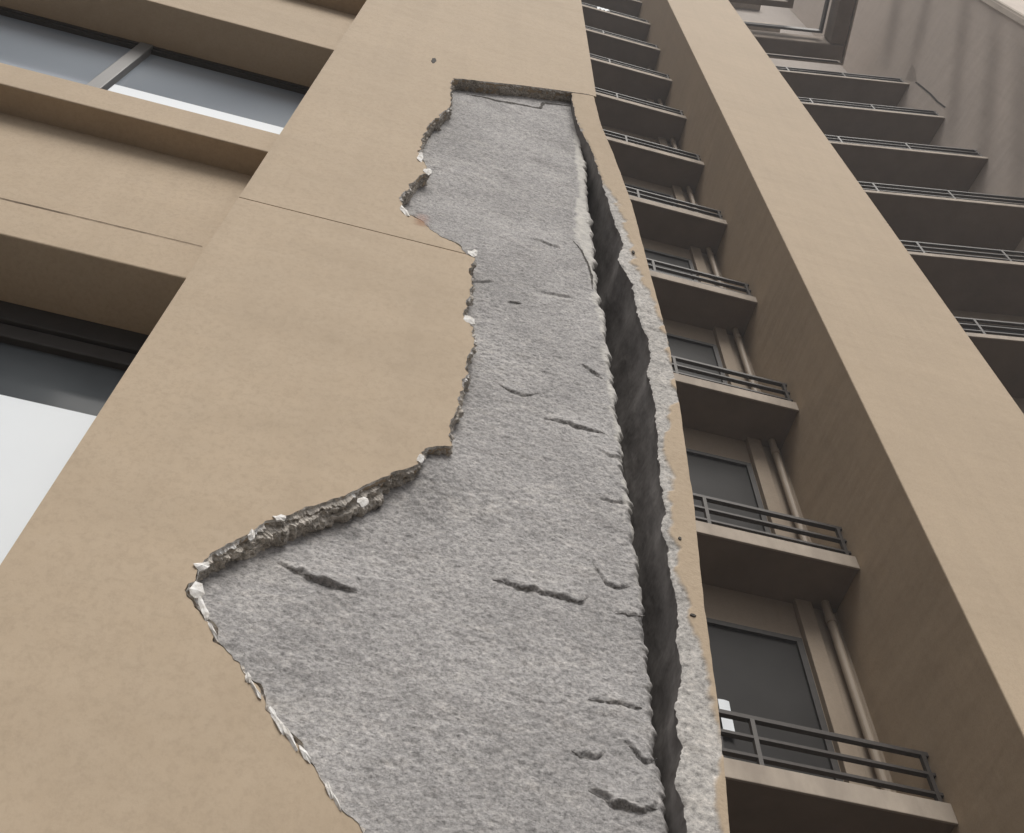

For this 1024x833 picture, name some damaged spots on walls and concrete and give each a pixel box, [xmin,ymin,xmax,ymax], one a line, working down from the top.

flaking render [185,78,669,833]
crack [468,94,687,833]